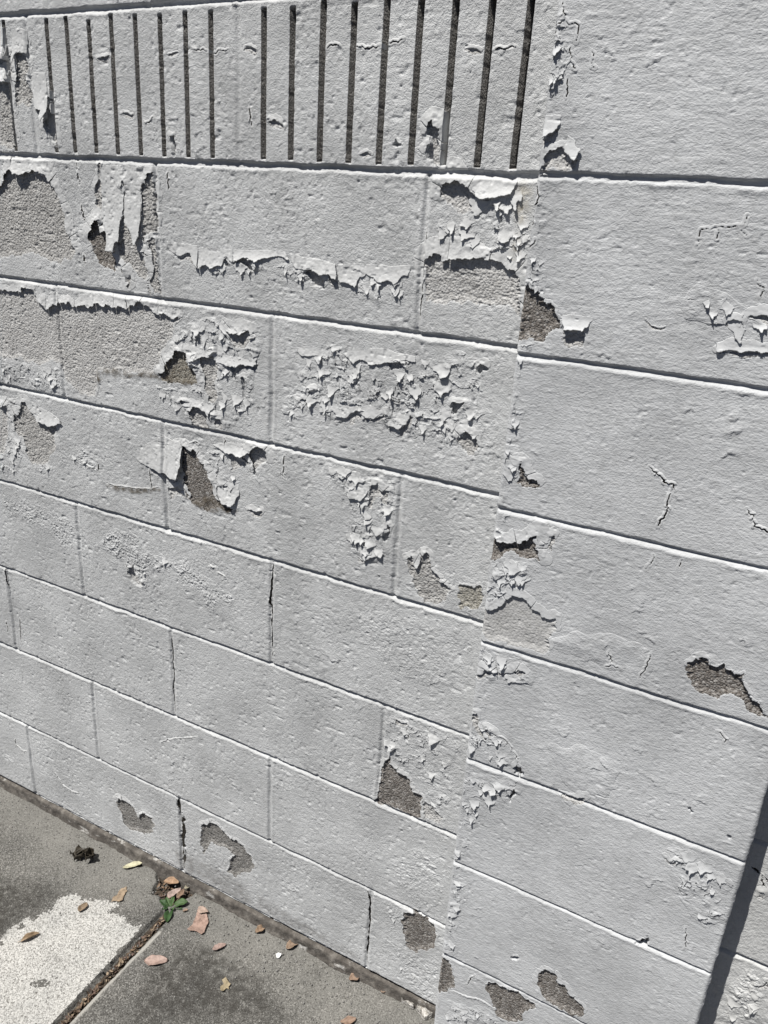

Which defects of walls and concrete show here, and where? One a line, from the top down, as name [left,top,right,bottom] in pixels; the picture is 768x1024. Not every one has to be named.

peeling [0,27,593,475]
peeling [712,303,768,359]
peeling [136,435,265,518]
peeling [491,519,560,566]
crack [643,464,685,572]
peeling [401,546,562,654]
peeling [684,651,768,718]
peeling [112,793,156,835]
peeling [198,818,258,878]
peeling [370,752,445,823]
peeling [400,907,455,993]
peeling [484,965,588,1022]